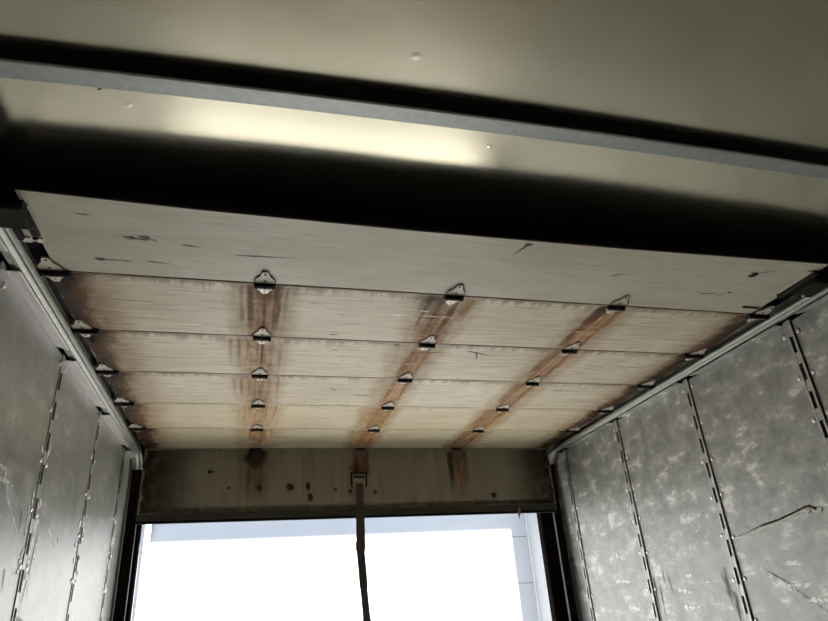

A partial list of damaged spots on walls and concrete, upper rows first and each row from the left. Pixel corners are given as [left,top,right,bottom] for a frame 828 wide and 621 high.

corrosion [248,287,280,328]
corrosion [419,296,474,342]
corrosion [537,307,620,376]